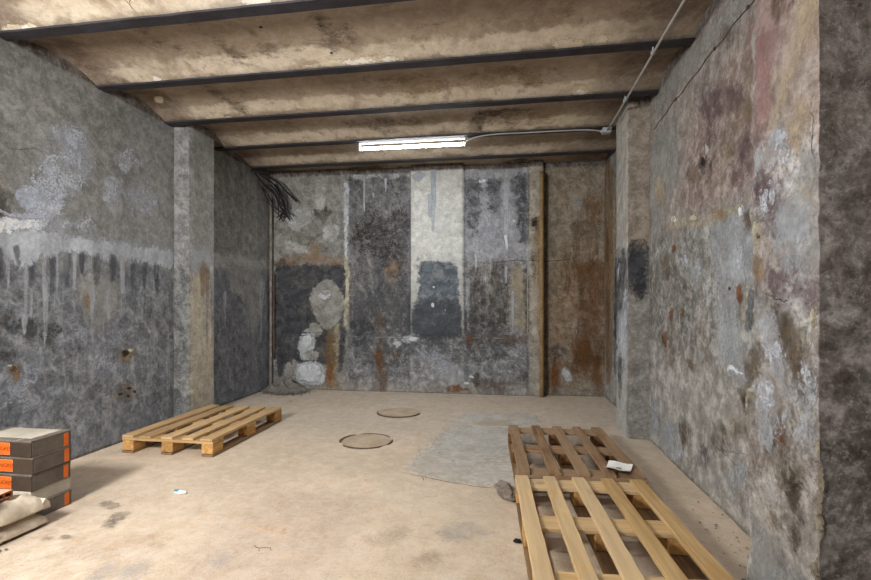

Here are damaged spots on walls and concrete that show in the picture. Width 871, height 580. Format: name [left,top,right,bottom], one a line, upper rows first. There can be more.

efflorescence [0,121,97,235]
efflorescence [98,145,159,214]
damp [727,120,790,218]
damp [0,313,62,341]
damp [74,270,123,373]
peeling [301,322,323,347]
damp [0,370,38,409]